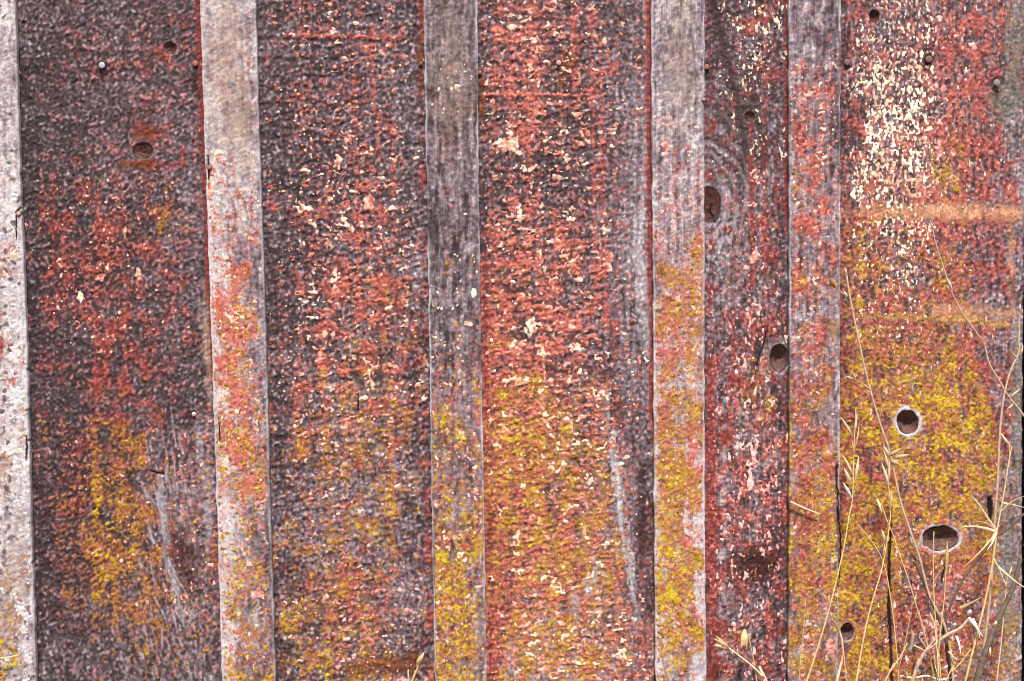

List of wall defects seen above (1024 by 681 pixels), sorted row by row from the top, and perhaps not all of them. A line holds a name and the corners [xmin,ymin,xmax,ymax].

peeling [0,169,196,422]
peeling [86,0,845,681]
peeling [833,0,1011,417]
peeling [0,435,32,681]
crack [835,466,843,587]
crack [885,523,893,681]
peeling [842,390,1019,681]